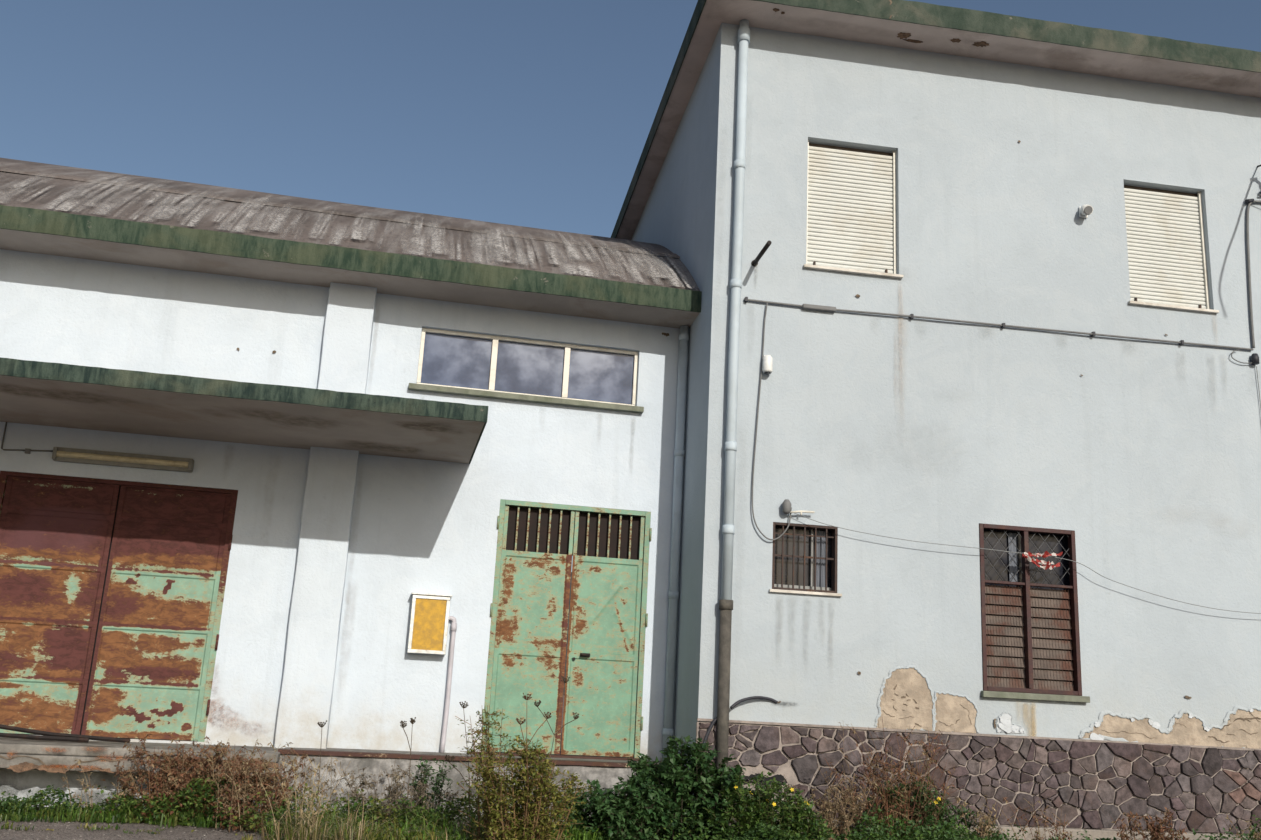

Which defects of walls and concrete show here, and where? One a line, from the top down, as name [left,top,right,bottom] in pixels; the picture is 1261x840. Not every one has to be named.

spalling [897,32,923,43]
peeling [875,665,979,733]
peeling [994,712,1026,734]
peeling [1079,705,1261,749]